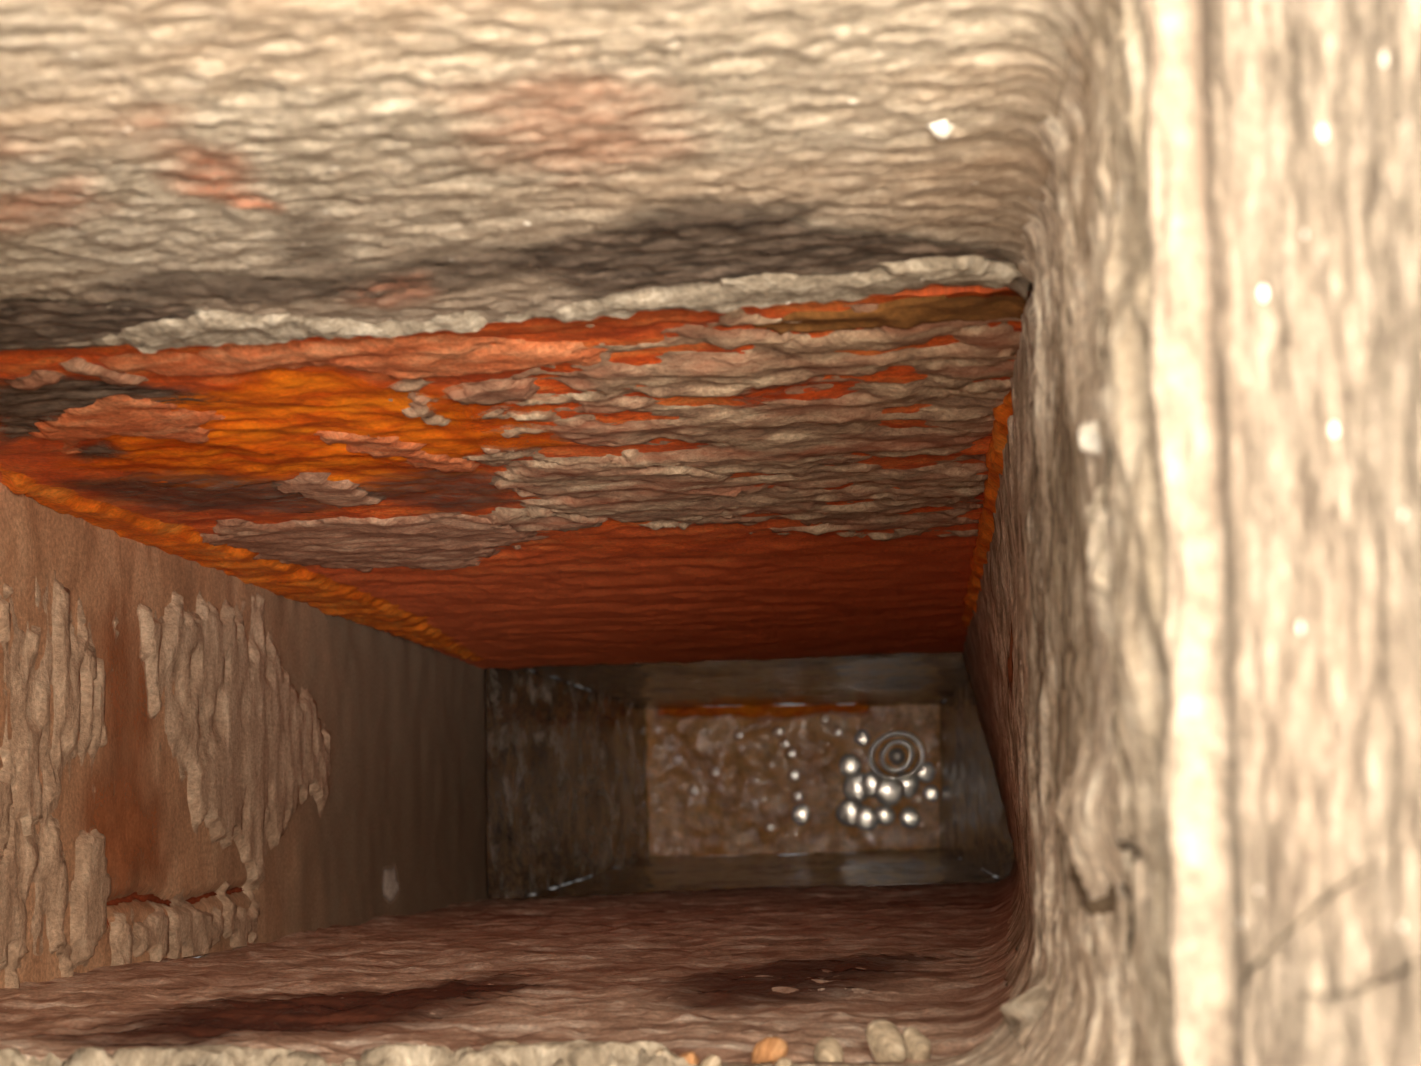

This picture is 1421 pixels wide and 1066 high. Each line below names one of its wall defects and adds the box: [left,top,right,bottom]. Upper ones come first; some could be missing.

crack [1107,129,1117,216]
rust [79,368,555,493]
peeling [200,472,549,573]
peeling [313,431,480,473]
peeling [4,255,1029,454]
rust [744,382,817,405]
spalling [961,390,1013,639]
crack [1103,414,1112,514]
peeling [0,570,331,989]
damp [684,954,921,1007]
crack [1111,701,1141,1037]
crack [1239,867,1373,989]